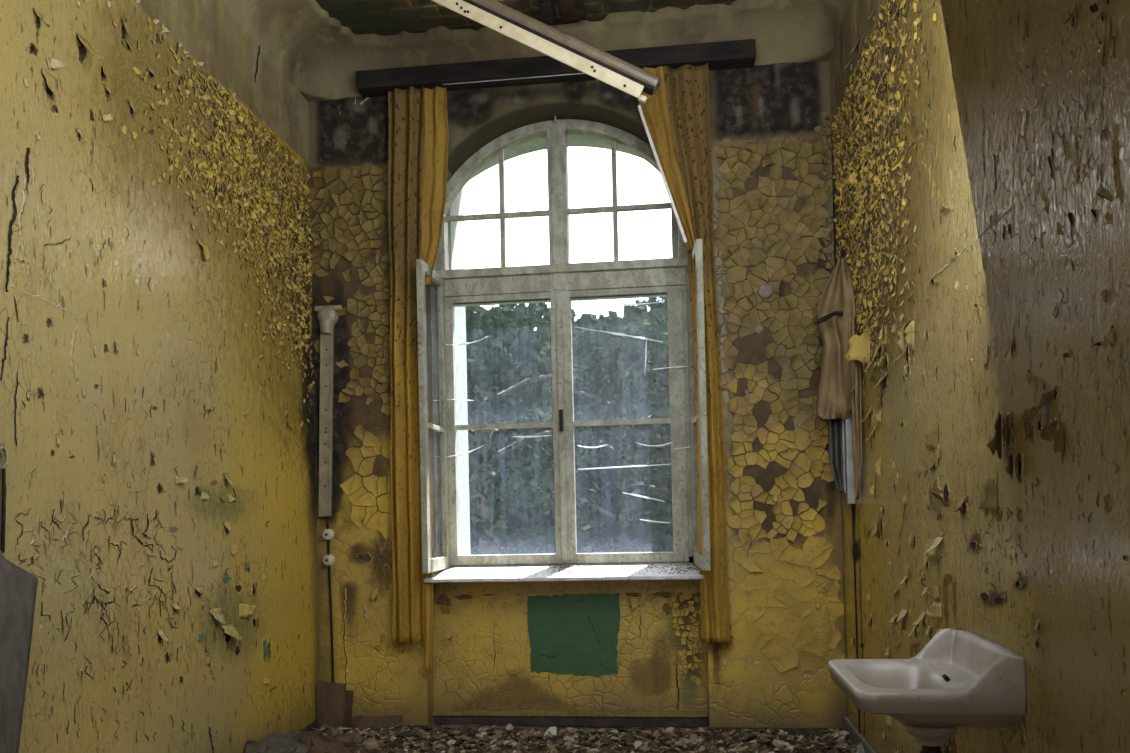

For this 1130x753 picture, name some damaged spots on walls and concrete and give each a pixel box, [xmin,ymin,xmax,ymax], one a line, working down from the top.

spalling [316,0,486,36]
spalling [496,0,737,26]
crack [0,148,215,446]
peeling [28,0,391,603]
peeling [714,0,940,692]
crack [14,464,297,753]
crack [674,658,682,711]
peeling [889,369,1065,650]